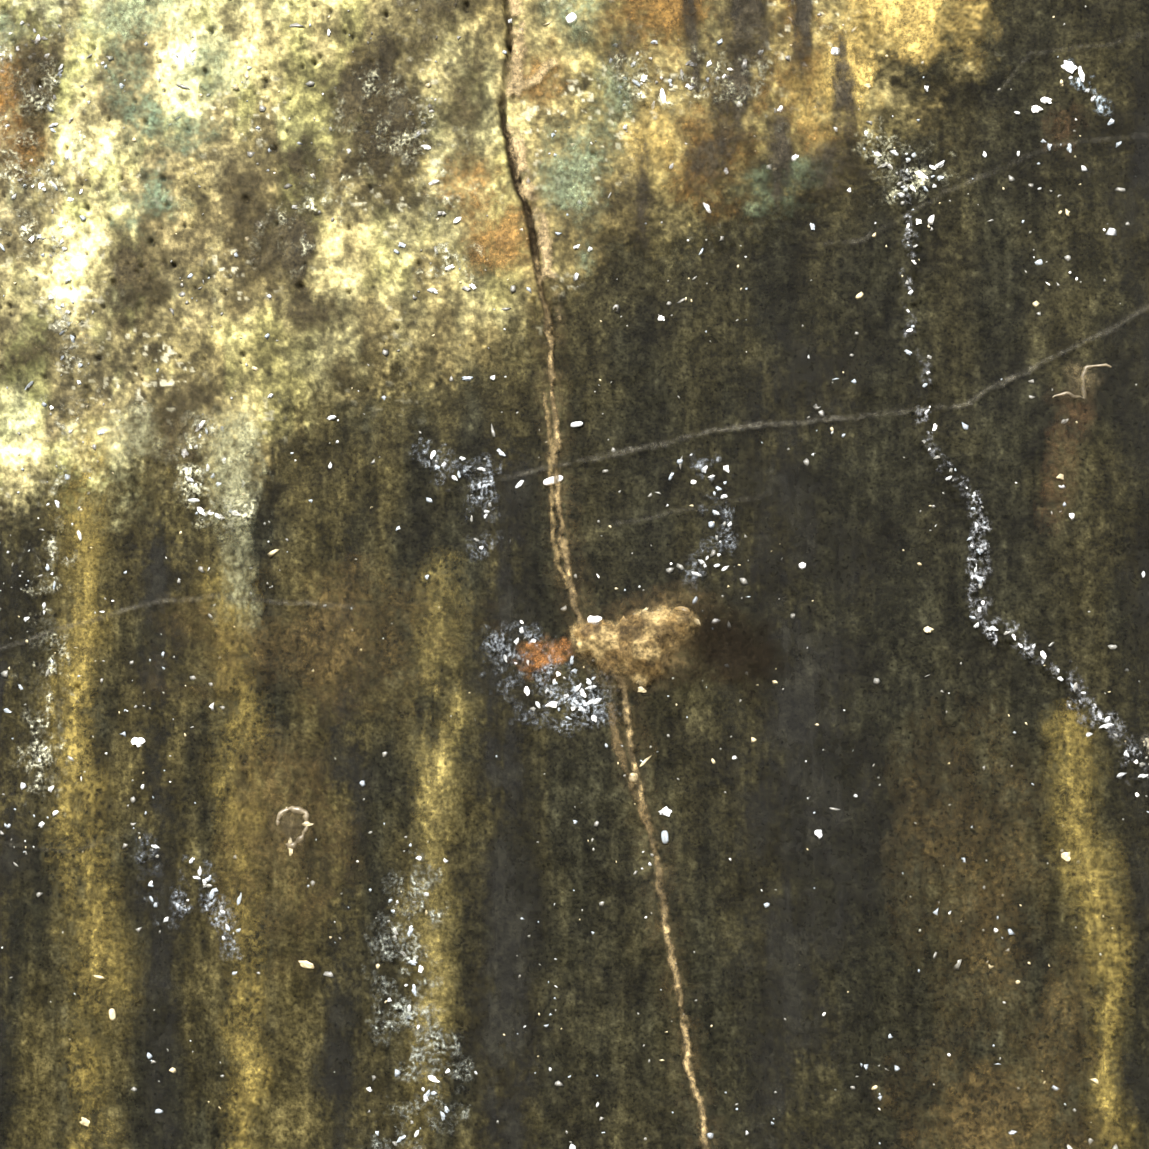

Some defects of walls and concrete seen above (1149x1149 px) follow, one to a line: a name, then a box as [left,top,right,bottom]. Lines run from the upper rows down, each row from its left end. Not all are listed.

damp [0,21,91,202]
damp [329,0,465,206]
damp [617,74,673,110]
damp [680,0,769,127]
damp [791,0,812,76]
damp [85,223,165,328]
damp [227,132,348,328]
damp [421,169,461,223]
damp [422,244,476,293]
crack [499,0,585,627]
corrosion [527,644,562,668]
crack [610,670,708,1149]